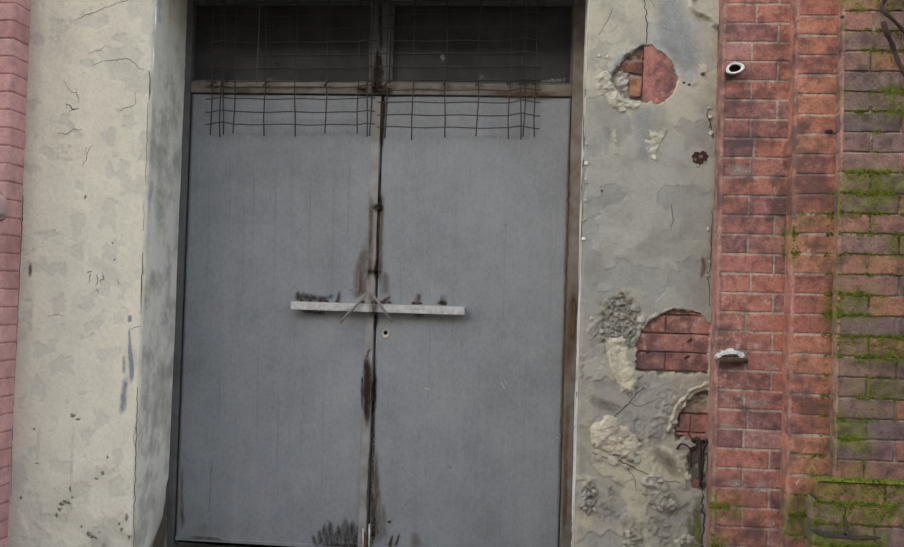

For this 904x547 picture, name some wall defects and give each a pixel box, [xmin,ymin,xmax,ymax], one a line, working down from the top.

crack [644,0,681,44]
spalling [595,43,691,112]
crack [57,81,89,164]
crack [91,46,151,182]
peeling [644,127,667,160]
spalling [692,151,708,167]
rust [358,203,386,294]
spalling [586,289,710,519]
spalling [579,478,599,516]